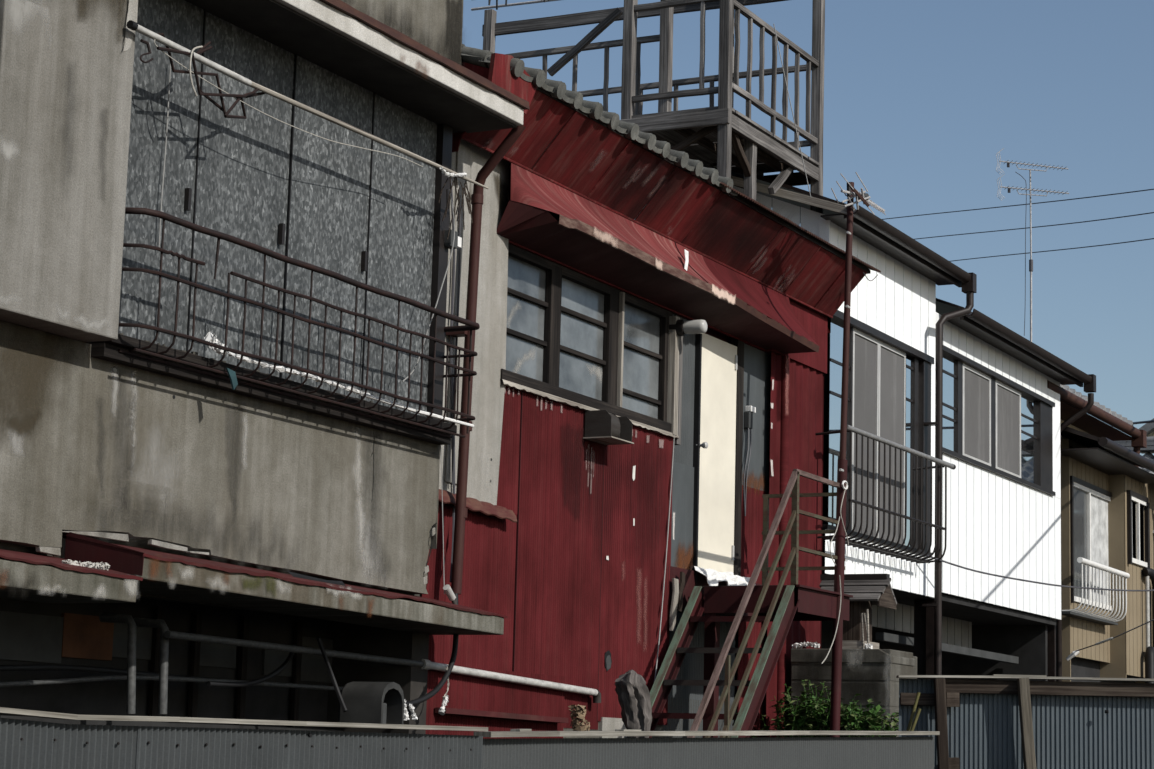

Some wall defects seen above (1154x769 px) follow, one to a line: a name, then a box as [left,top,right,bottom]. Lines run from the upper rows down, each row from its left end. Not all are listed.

damp [2,142,17,158]
peeling [712,284,735,304]
damp [0,325,71,450]